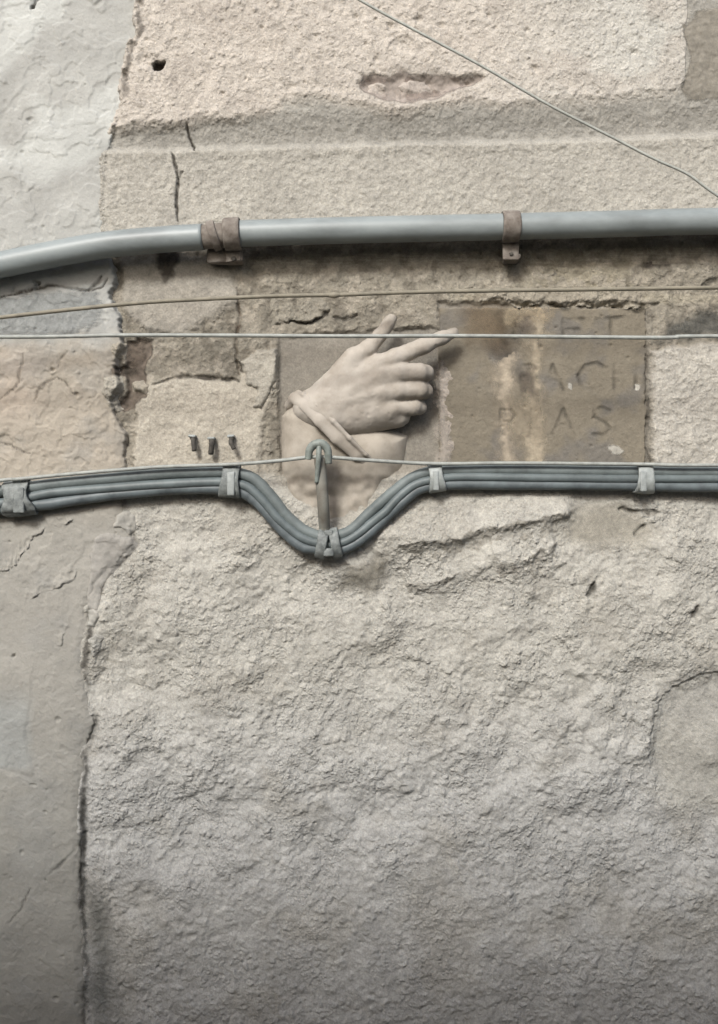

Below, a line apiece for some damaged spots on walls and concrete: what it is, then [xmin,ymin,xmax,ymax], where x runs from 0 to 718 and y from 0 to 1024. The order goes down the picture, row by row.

spalling [359,71,482,103]
crack [172,126,195,221]
leakage [505,307,546,461]
crack [83,626,92,678]